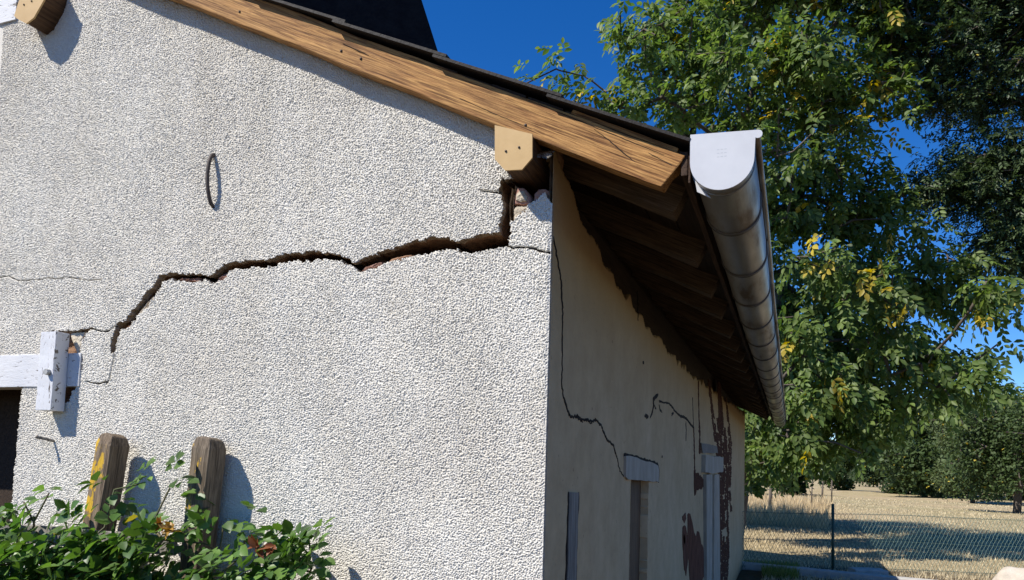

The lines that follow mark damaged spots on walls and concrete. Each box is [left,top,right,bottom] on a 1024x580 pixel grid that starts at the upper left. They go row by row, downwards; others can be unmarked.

crack [87,180,624,477]
crack [644,393,694,435]
flaking render [694,473,704,496]
flaking render [682,513,704,580]